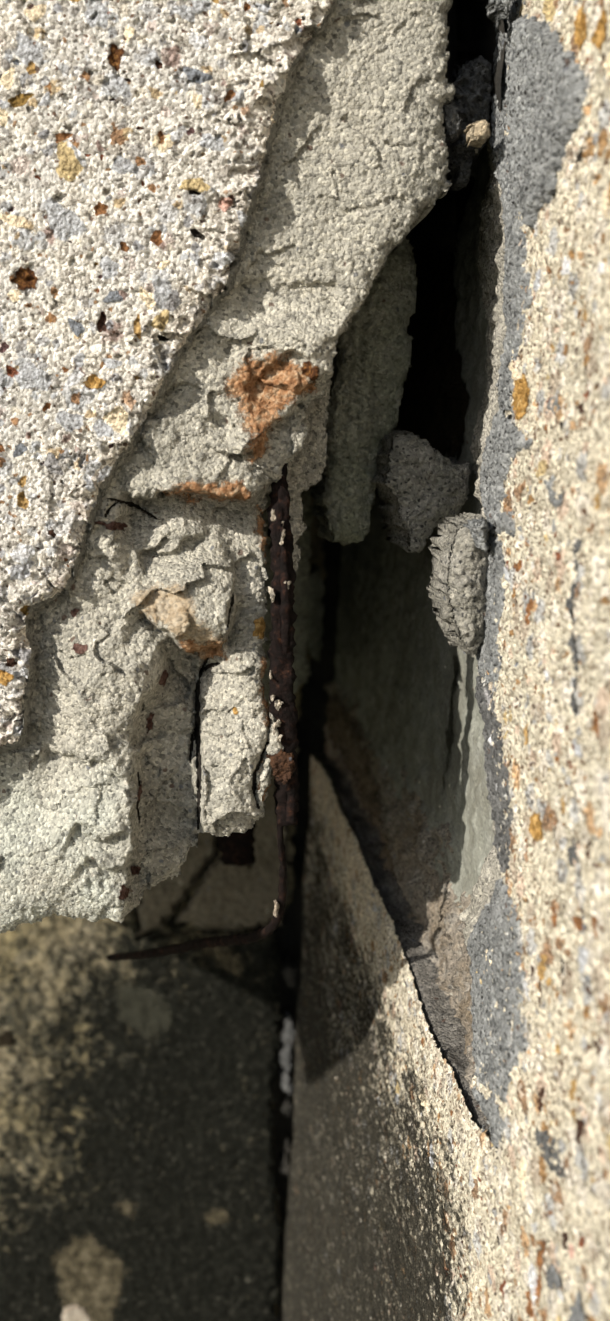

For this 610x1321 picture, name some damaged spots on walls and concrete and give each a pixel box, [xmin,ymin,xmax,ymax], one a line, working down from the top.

crack [445,0,506,119]
spalling [0,0,456,937]
corrosion [225,350,319,463]
crack [392,190,456,253]
spalling [444,119,507,520]
crack [170,658,221,917]
crack [226,594,234,628]
corrosion [159,463,301,826]
corrosion [218,822,257,866]
spalling [309,495,501,1134]
crack [443,655,458,786]
damp [0,773,470,1321]